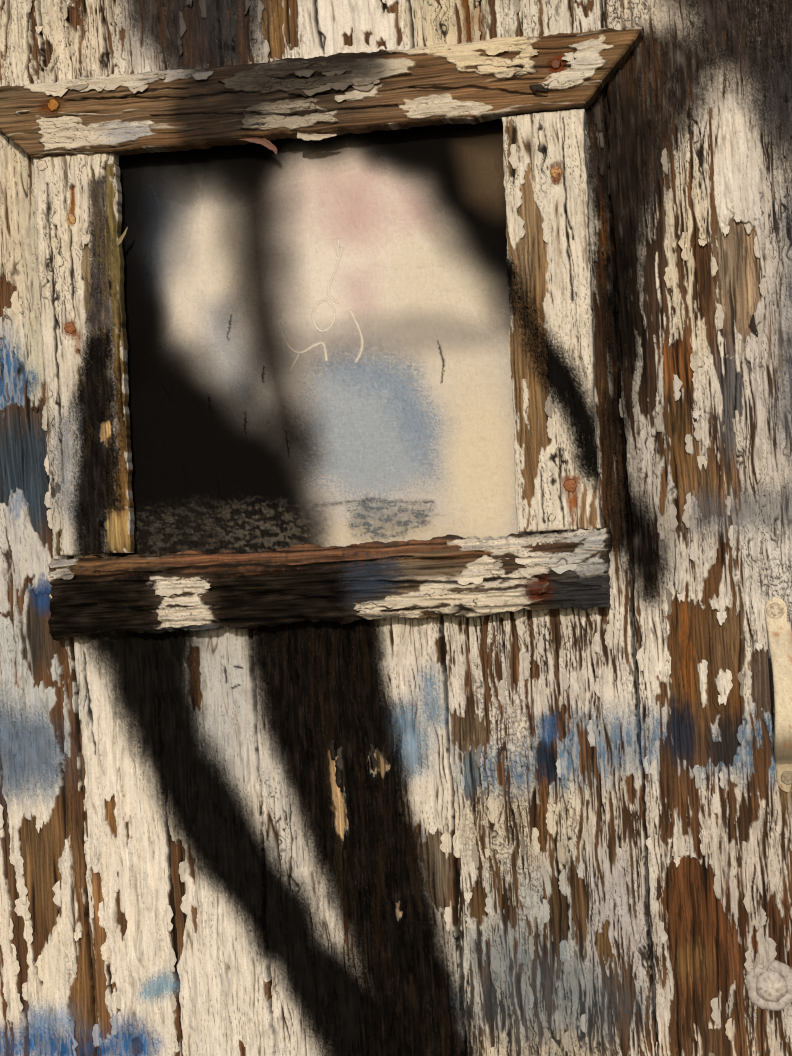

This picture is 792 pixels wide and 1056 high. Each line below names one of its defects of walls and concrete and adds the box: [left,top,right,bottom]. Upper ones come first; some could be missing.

rust [548,55,566,73]
peeling [0,0,642,633]
rust [562,476,578,524]
peeling [327,739,348,841]
peeling [370,744,390,778]
peeling [161,827,207,1056]